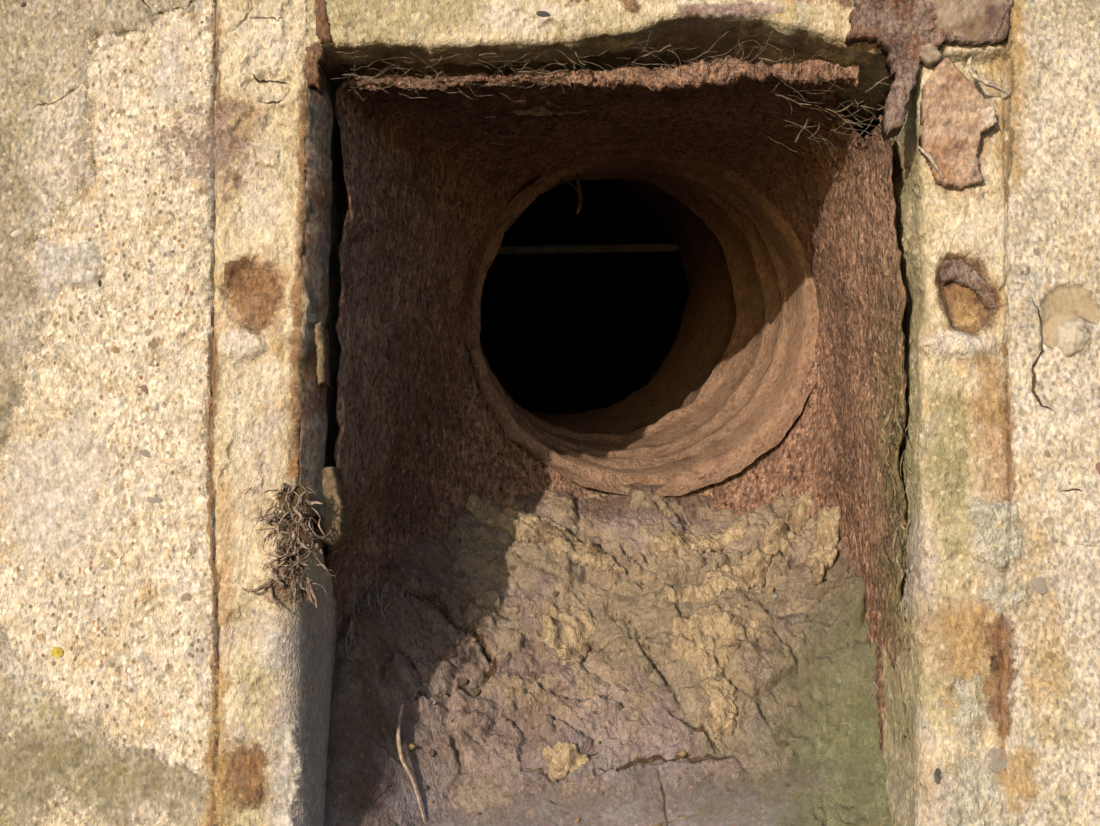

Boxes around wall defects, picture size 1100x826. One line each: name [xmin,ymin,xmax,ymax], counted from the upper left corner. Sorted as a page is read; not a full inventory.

crack [82,0,195,54]
rust [918,0,1022,201]
rust [220,42,327,367]
spalling [1041,284,1100,349]
rust [202,336,277,826]
rust [268,382,314,604]
rust [942,606,1019,738]
rust [998,748,1038,813]